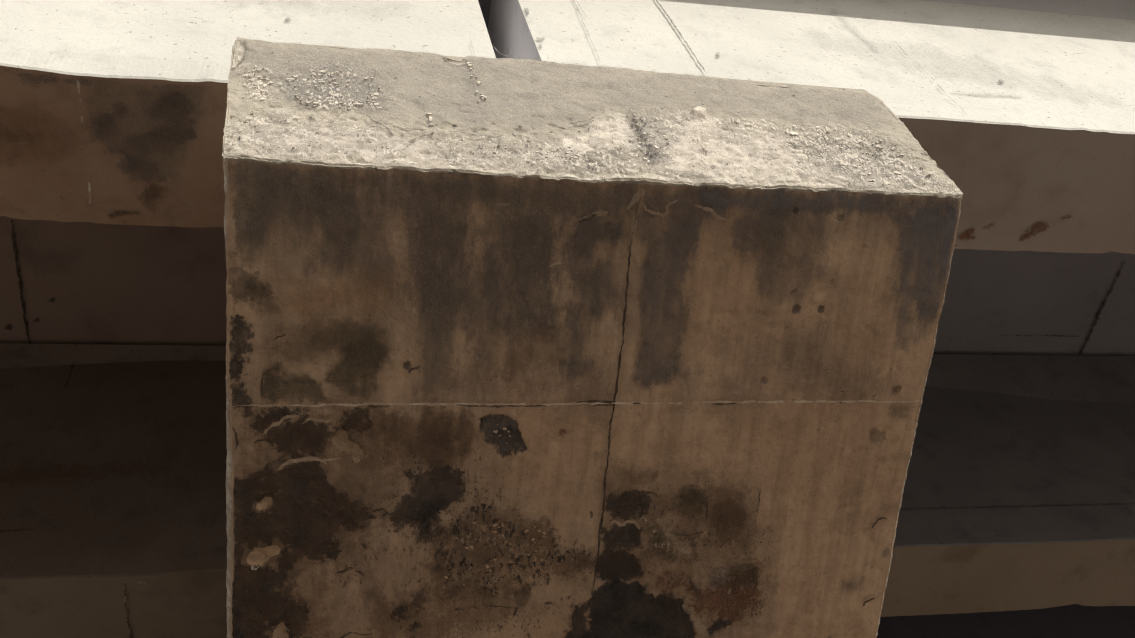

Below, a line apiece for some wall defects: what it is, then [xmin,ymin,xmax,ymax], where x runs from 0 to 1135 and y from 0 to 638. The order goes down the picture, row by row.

water stain [226,110,957,387]
water stain [229,315,551,638]
water stain [547,480,767,638]